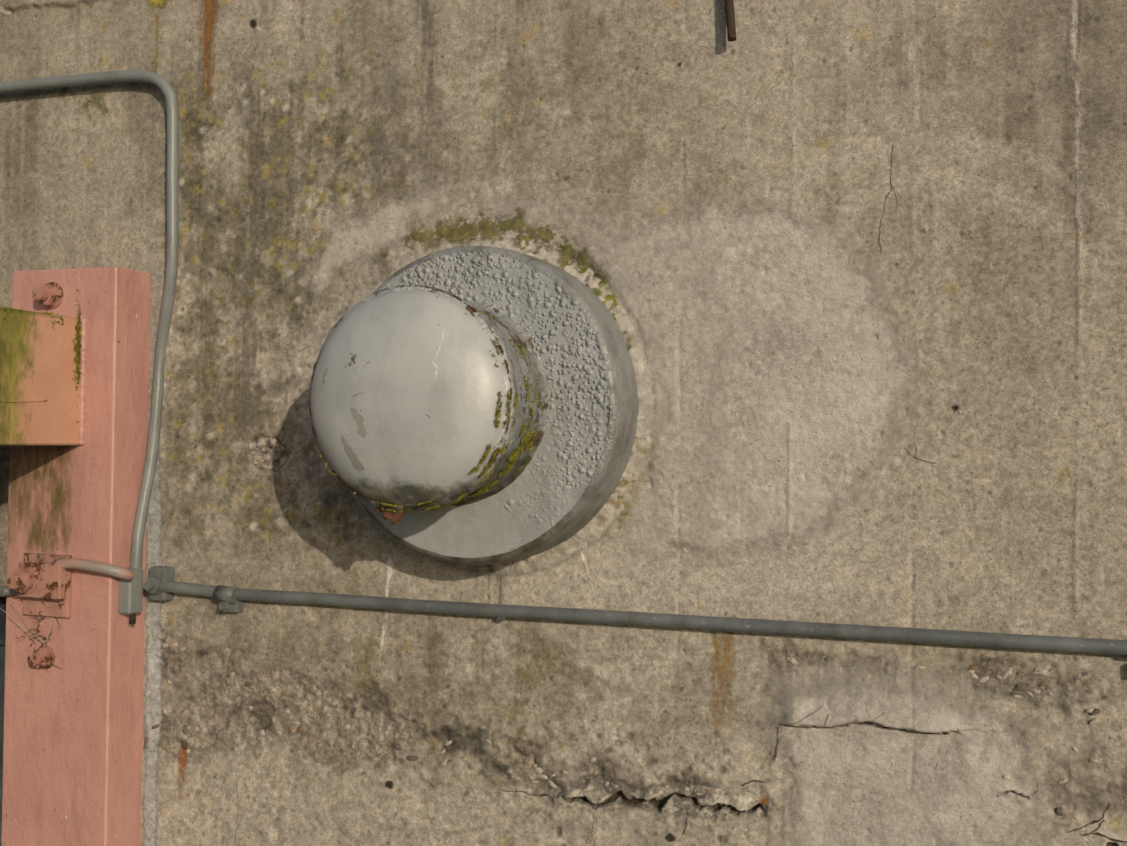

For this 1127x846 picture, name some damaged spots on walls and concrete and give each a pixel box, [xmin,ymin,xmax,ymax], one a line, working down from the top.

corrosion [204,0,218,95]
spalling [143,630,425,775]
crack [497,705,1001,846]
crack [1067,803,1127,846]